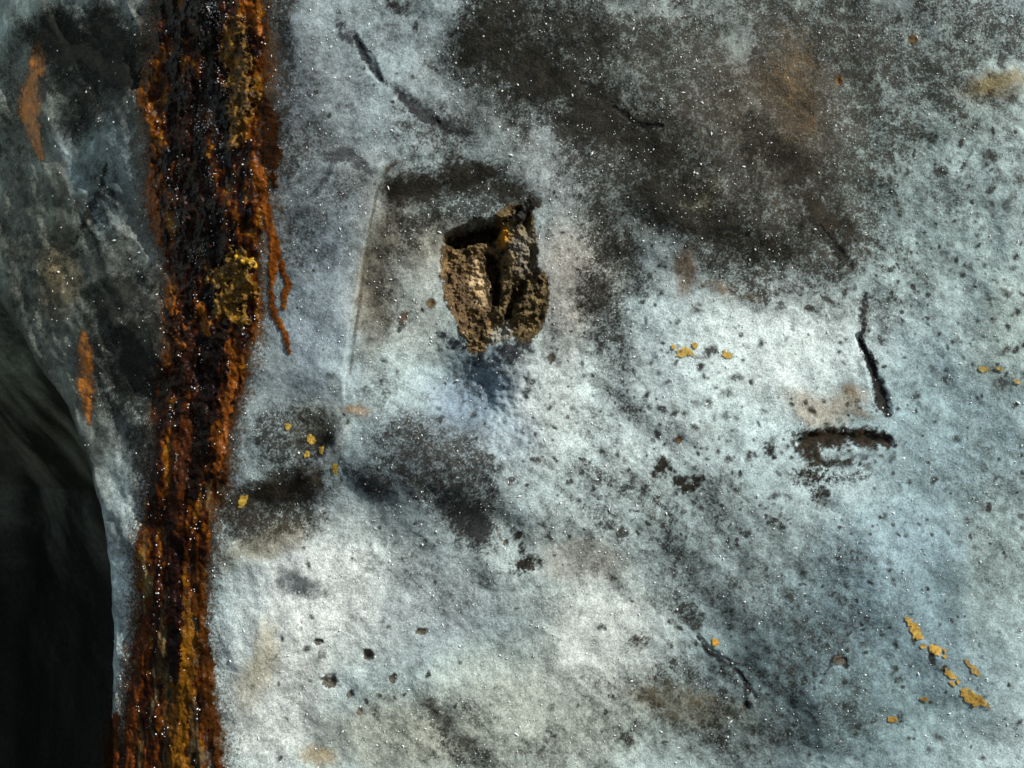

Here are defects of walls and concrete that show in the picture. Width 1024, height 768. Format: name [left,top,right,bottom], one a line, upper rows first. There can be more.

corrosion [14,34,49,161]
water stain [380,154,541,237]
water stain [438,0,864,339]
spalling [426,196,550,355]
corrosion [74,328,97,426]
corrosion [98,0,293,768]
crack [858,292,890,418]